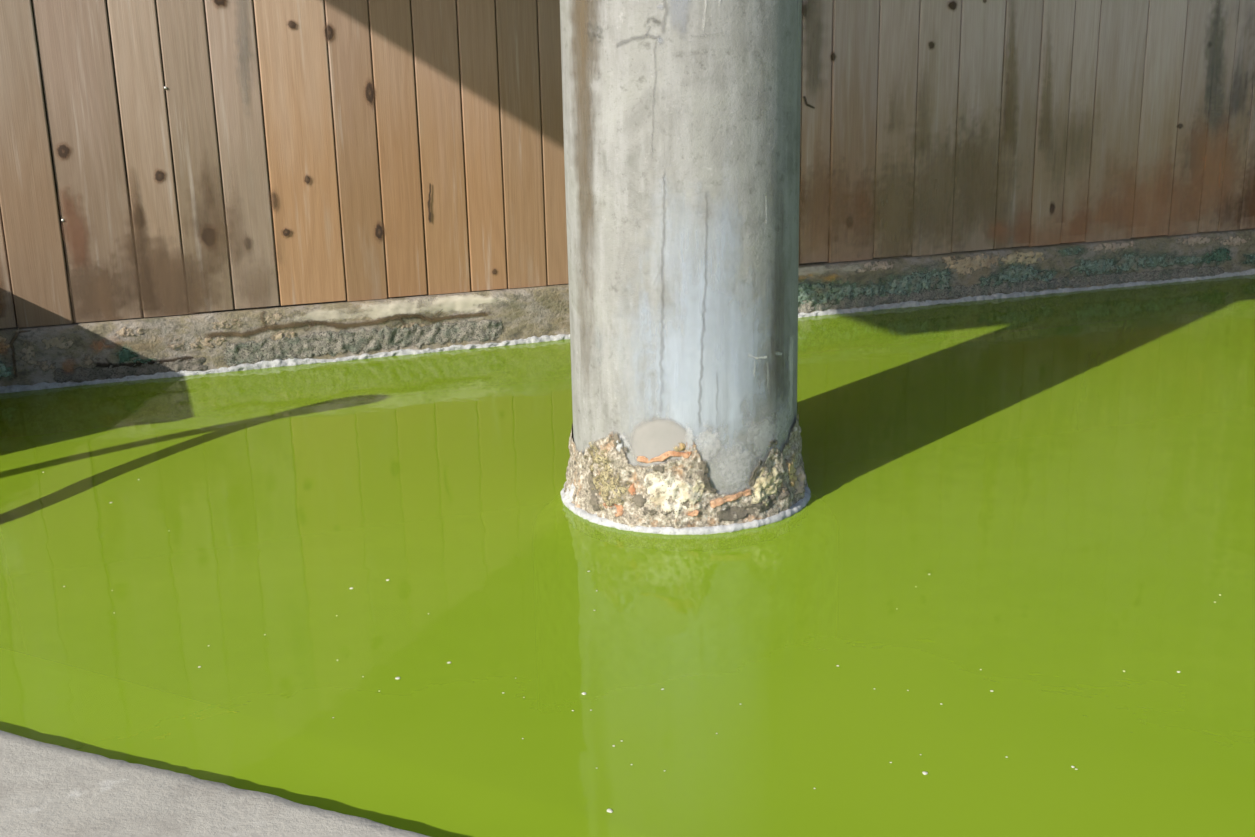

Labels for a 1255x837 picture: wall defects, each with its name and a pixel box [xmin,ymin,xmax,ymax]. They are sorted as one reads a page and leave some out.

damp [70,199,207,320]
crack [96,311,488,368]
spalling [562,415,808,552]